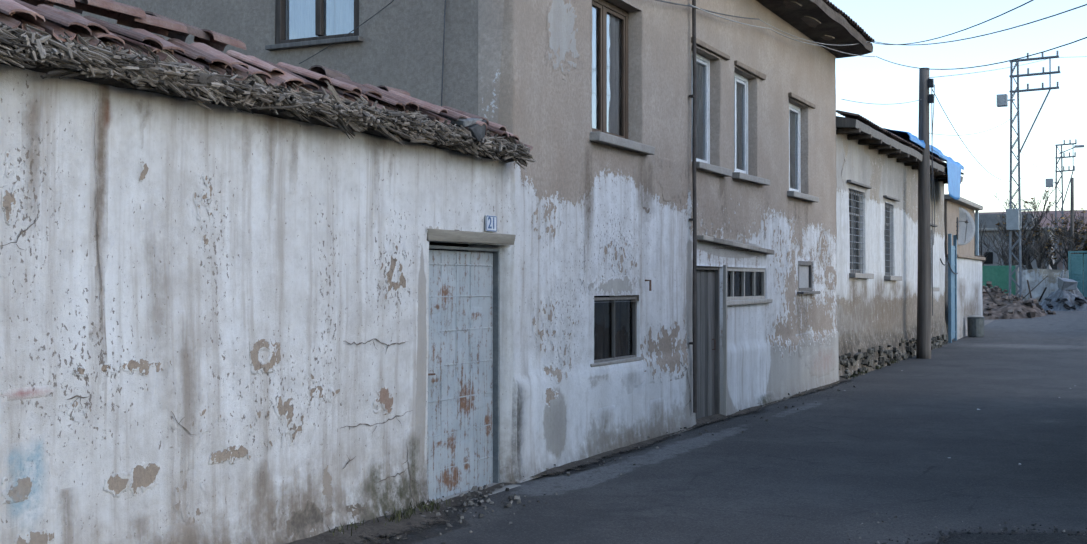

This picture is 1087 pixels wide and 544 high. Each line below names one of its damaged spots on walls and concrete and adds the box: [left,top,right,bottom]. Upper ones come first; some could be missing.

water stain [89,83,113,451]
spalling [378,241,407,304]
spalling [580,234,645,296]
spalling [691,172,917,370]
spalling [72,358,172,378]
spalling [249,339,281,374]
crack [346,338,408,351]
rust [427,271,492,497]
spalling [640,319,693,383]
spalling [209,370,341,465]
spalling [103,461,162,498]
spalling [14,528,54,544]